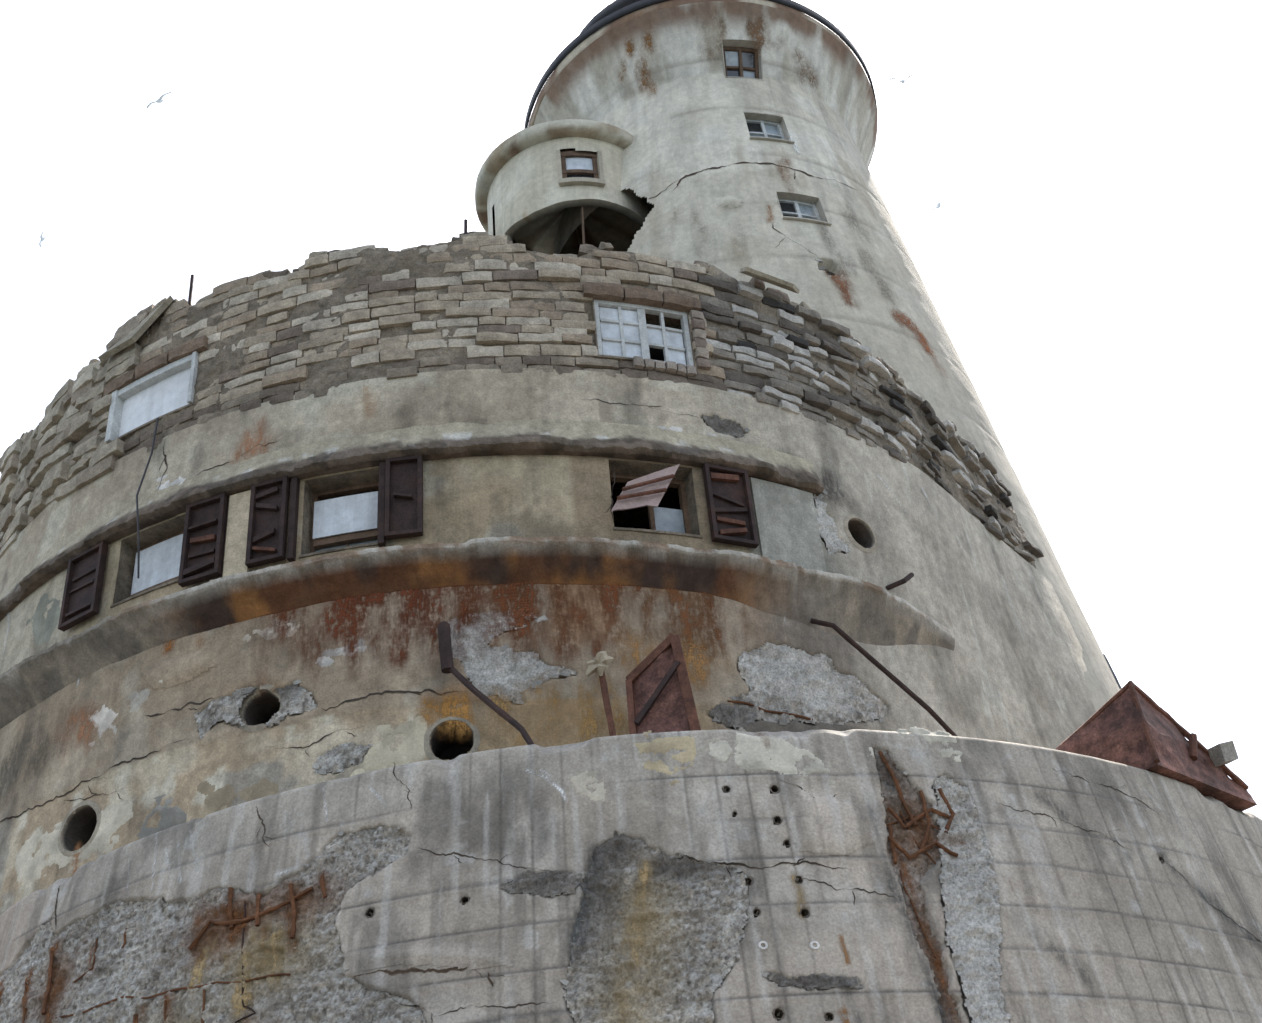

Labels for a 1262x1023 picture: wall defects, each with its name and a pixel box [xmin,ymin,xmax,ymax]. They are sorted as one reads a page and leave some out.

corrosion [621,33,655,93]
crack [649,162,854,199]
corrosion [893,312,933,356]
corrosion [310,582,541,665]
spalling [448,611,577,704]
corrosion [592,584,723,687]
crack [0,698,214,822]
crack [274,689,462,756]
spalling [634,642,889,786]
spalling [0,825,427,1023]
crack [672,855,892,905]
spalling [867,747,1011,1023]